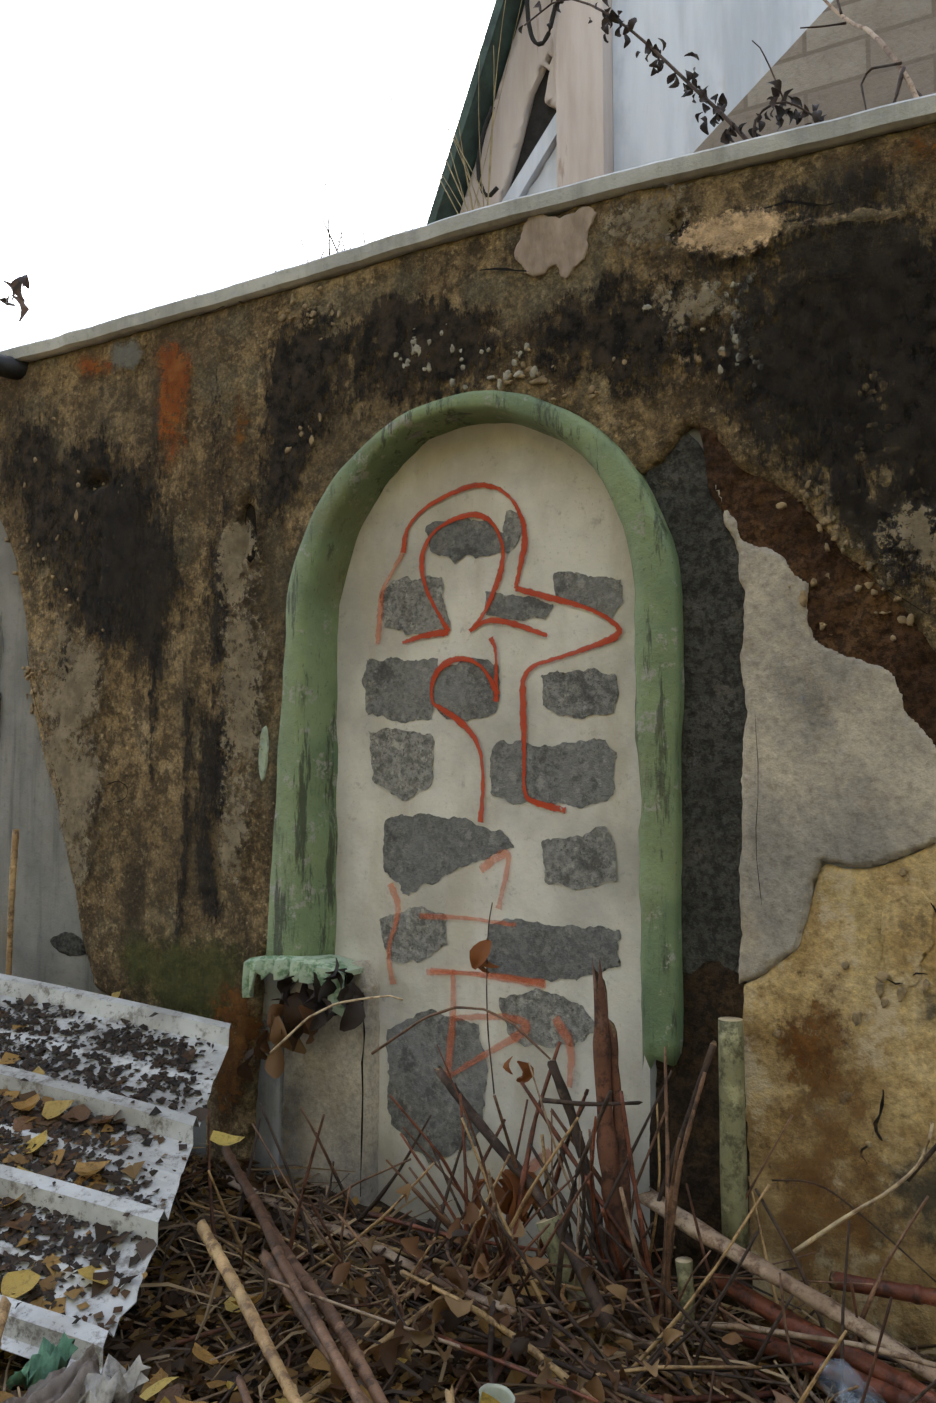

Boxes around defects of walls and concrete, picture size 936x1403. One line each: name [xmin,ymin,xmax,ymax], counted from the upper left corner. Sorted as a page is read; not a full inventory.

peeling [514,206,597,279]
rust [153,341,192,465]
water stain [0,163,936,1134]
flaking render [646,425,936,1234]
flaking render [650,1209,753,1323]